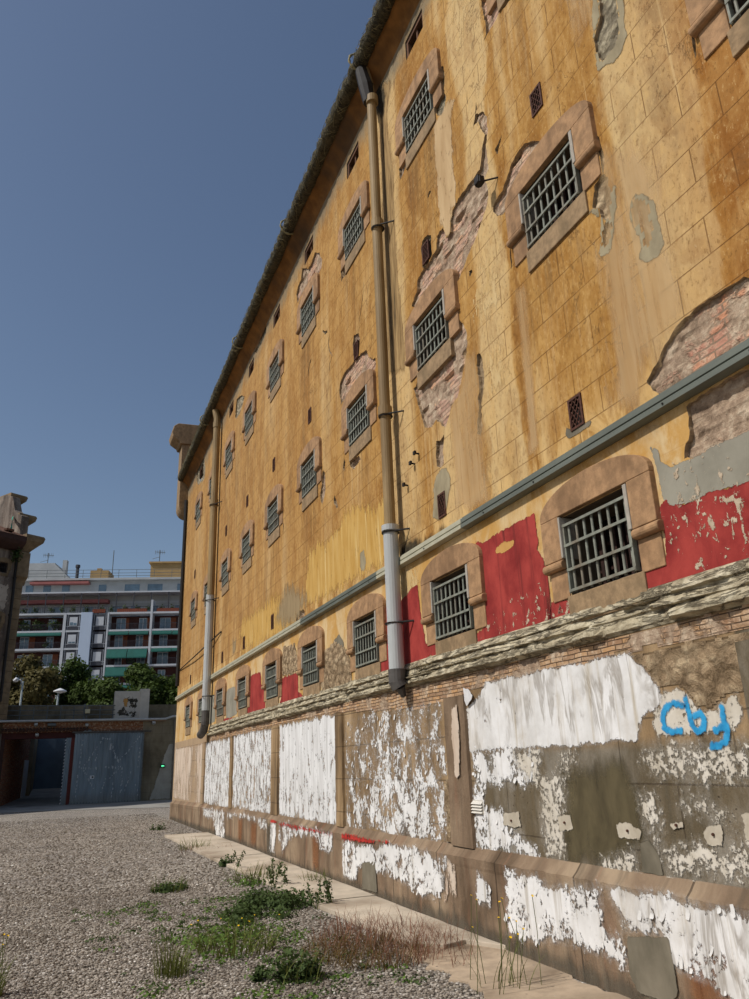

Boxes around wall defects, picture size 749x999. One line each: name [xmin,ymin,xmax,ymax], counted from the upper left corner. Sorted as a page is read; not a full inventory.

flaking render [481,1,499,40]
flaking render [591,0,627,70]
flaking render [590,174,617,256]
flaking render [630,193,664,262]
flaking render [647,277,749,394]
flaking render [414,323,484,468]
peeling [608,369,749,610]
peeling [476,513,570,642]
peeling [173,585,749,901]
peeling [475,873,491,907]
peeling [504,866,749,999]